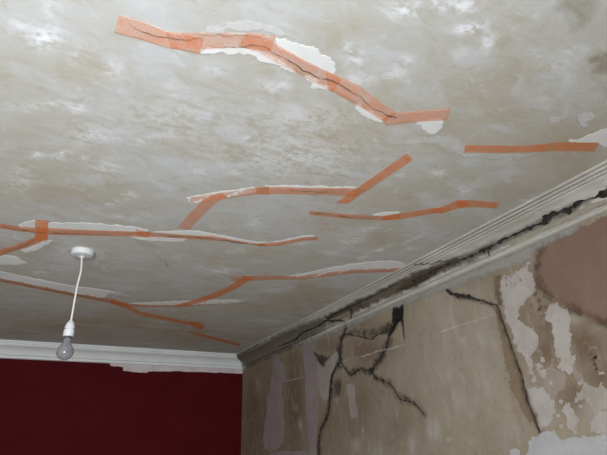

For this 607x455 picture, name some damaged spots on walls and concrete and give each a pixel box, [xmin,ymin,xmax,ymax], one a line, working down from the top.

crack [130,24,397,118]
crack [279,186,607,455]
peeling [495,215,607,437]